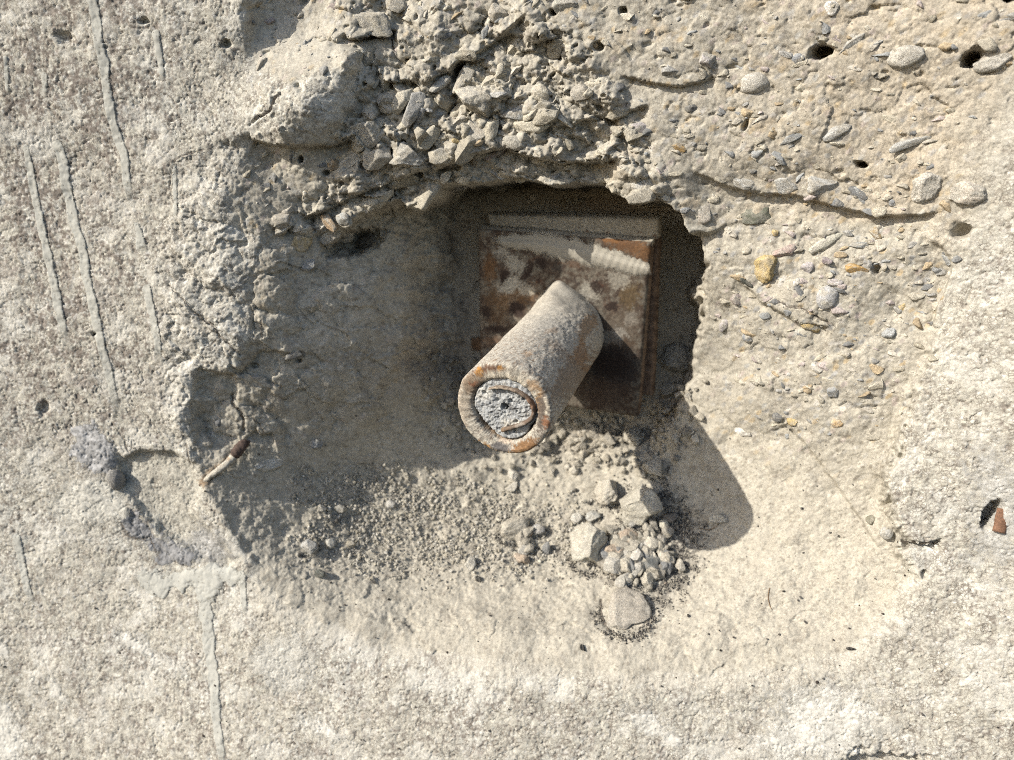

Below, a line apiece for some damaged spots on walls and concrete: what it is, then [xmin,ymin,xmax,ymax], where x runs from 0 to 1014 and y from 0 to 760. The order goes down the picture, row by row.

spalling [227,0,1014,442]